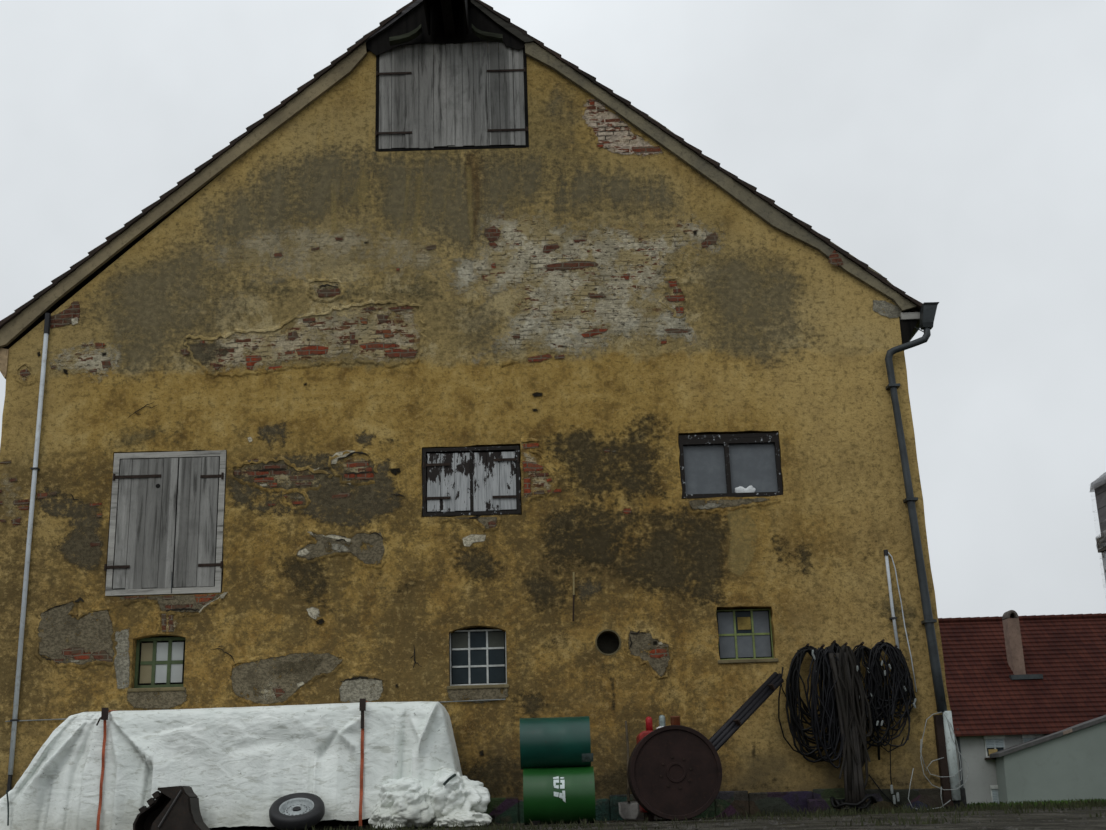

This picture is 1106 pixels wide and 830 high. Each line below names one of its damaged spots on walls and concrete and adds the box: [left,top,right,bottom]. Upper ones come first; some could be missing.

flaking render [581,99,662,157]
water stain [556,165,680,218]
flaking render [50,301,80,328]
flaking render [181,277,427,378]
water stain [90,149,542,372]
flaking render [447,210,724,368]
water stain [685,258,801,364]
flaking render [292,527,389,570]
water stain [523,414,730,611]
flaking render [226,649,398,707]